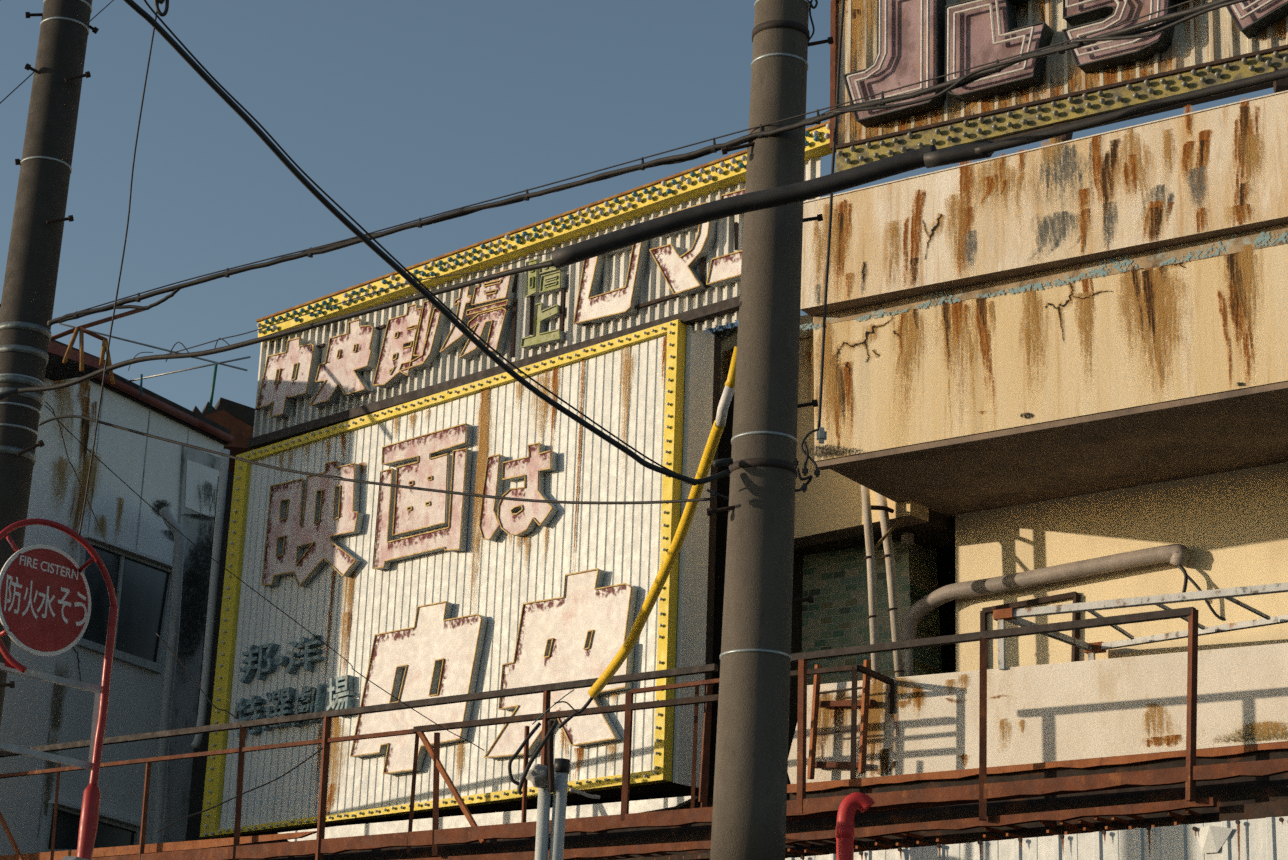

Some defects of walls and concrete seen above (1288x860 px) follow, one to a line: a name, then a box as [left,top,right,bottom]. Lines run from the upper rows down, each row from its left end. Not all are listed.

corrosion [886,190,925,285]
crack [922,213,944,260]
corrosion [945,149,1026,272]
corrosion [1078,105,1211,255]
corrosion [1229,99,1262,226]
crack [800,316,901,374]
corrosion [936,297,994,408]
crack [1045,262,1185,341]
corrosion [1217,245,1258,385]
corrosion [473,388,490,573]
corrosion [816,677,925,776]
damp [1216,721,1288,743]